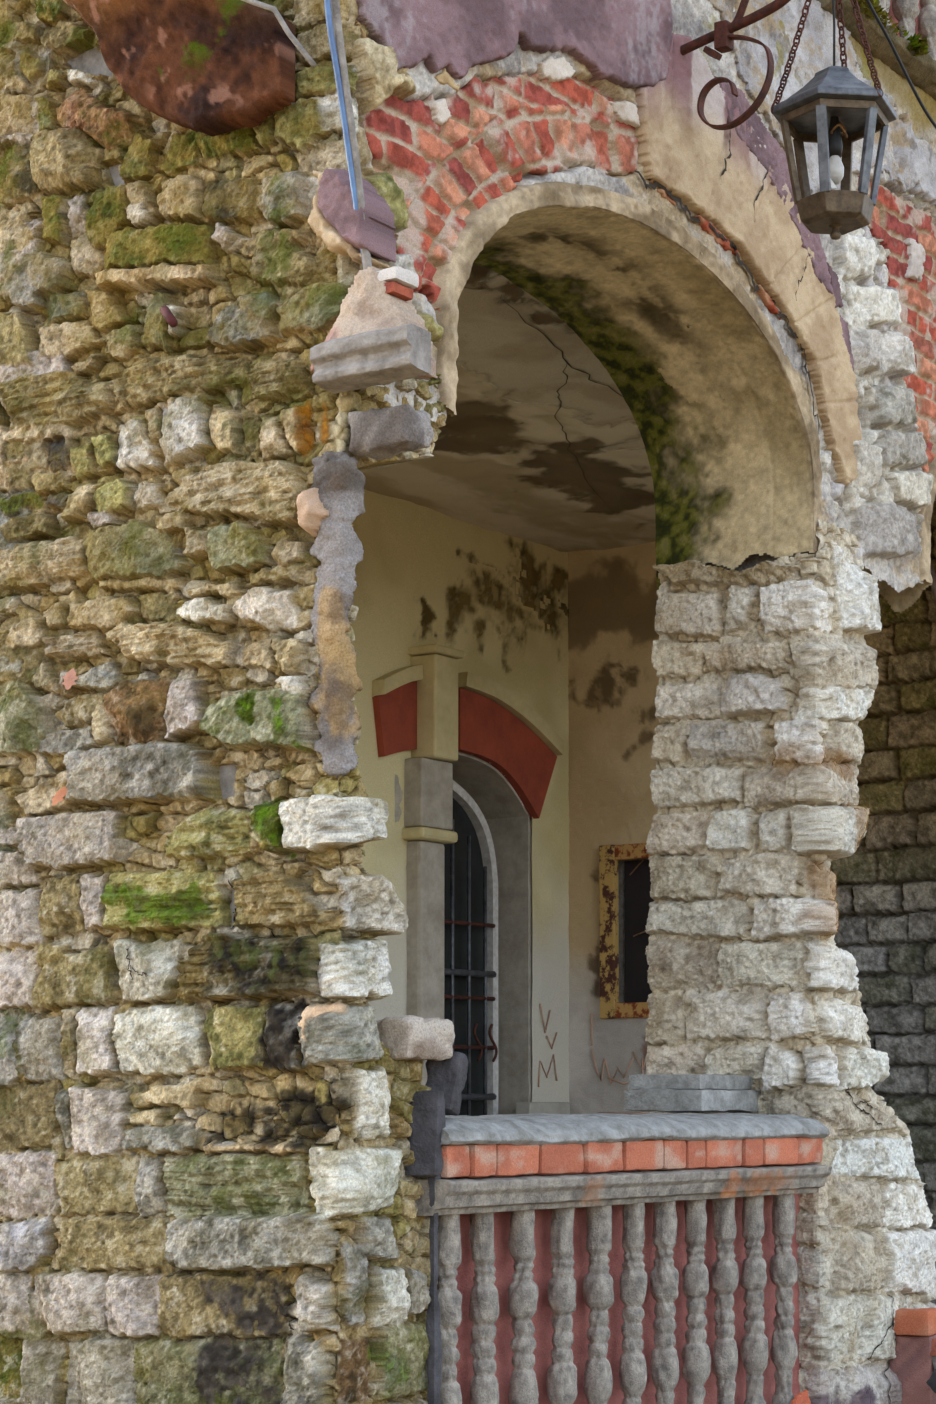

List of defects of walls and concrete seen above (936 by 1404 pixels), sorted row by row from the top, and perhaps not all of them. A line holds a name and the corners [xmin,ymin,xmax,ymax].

spalling [308,0,674,311]
flaking render [708,0,936,473]
flaking render [433,263,655,515]
crack [500,292,623,511]
leakage [570,663,638,711]
leakage [624,707,656,757]